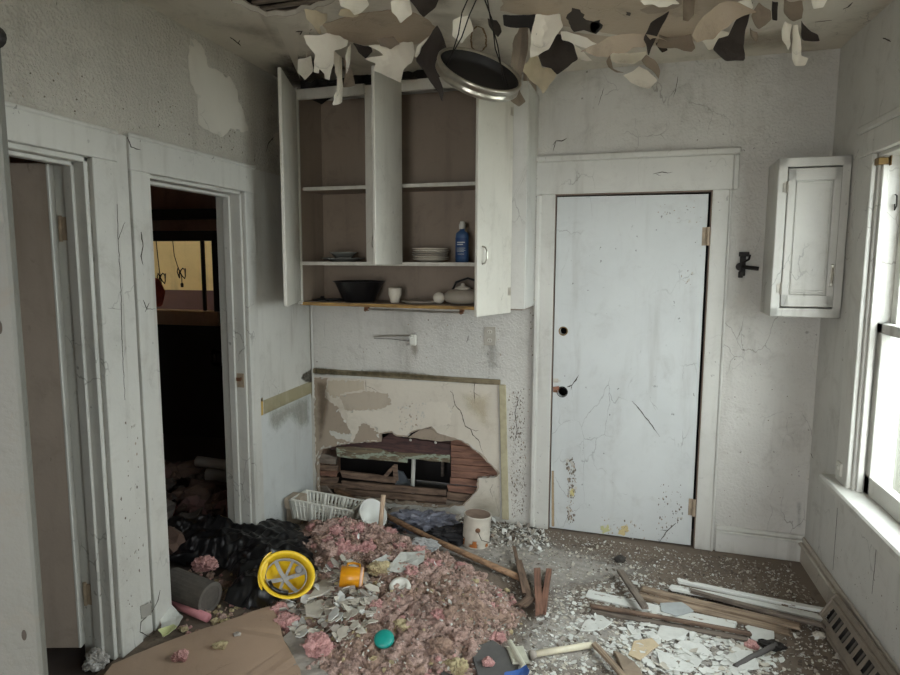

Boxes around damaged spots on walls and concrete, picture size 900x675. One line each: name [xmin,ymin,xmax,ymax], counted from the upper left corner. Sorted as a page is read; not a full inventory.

peeling [188,37,248,154]
peeling [298,0,473,105]
peeling [511,90,525,106]
peeling [488,0,827,93]
flaking render [314,377,530,518]
crack [453,384,483,452]